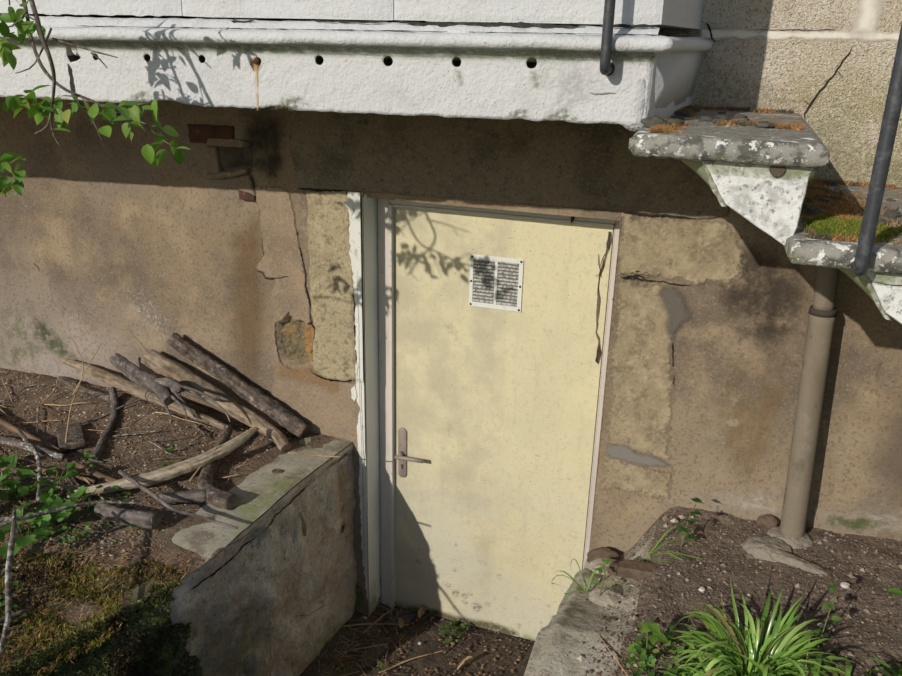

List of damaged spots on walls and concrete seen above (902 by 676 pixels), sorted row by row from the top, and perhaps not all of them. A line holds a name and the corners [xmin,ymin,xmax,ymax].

crack [759,26,833,34]
corrosion [250,57,261,108]
crack [804,47,852,119]
flaking render [187,124,256,201]
crack [623,211,694,219]
crack [621,275,690,286]
spalling [281,317,315,365]
crack [193,453,347,589]